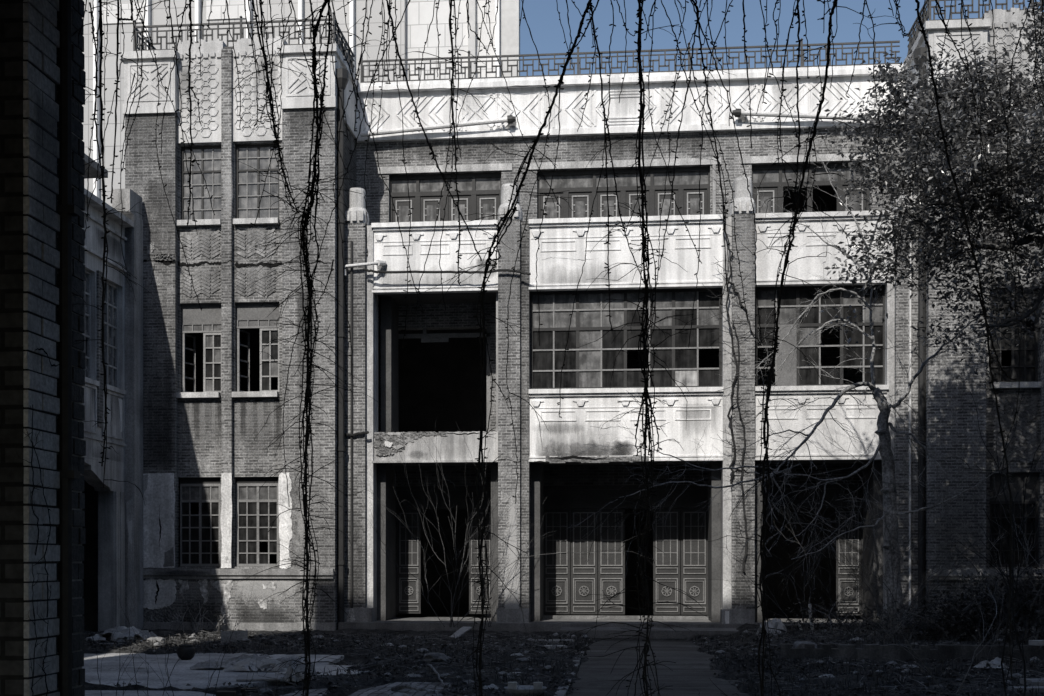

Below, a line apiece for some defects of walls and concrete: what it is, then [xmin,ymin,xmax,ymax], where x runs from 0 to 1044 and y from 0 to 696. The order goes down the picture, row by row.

crack [143,259,327,285]
water stain [553,442,631,456]
peeling [143,473,233,620]
water stain [235,579,296,605]